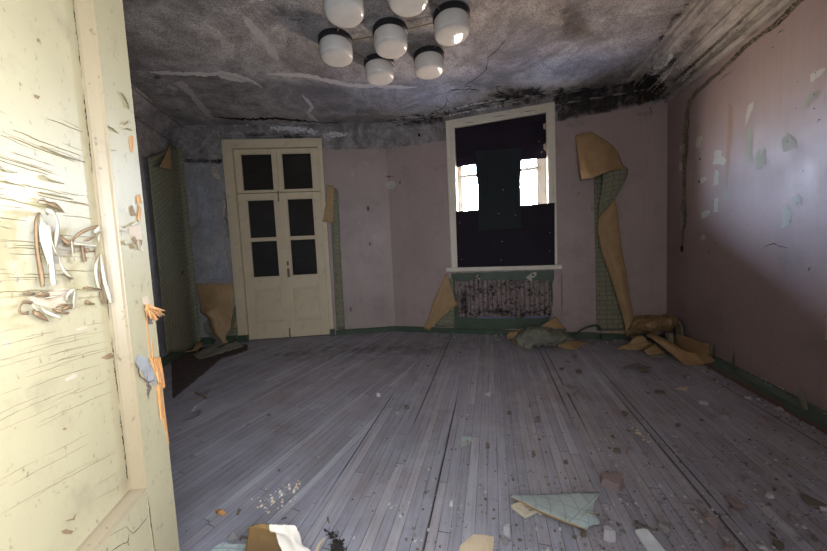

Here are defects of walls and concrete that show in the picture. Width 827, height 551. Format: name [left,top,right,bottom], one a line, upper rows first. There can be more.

crack [149,0,419,124]
crack [437,41,505,111]
mould [387,71,668,125]
crack [679,0,804,252]
peeling [18,192,113,322]
peeling [122,195,144,252]
mould [451,270,554,329]
peeling [136,355,158,387]